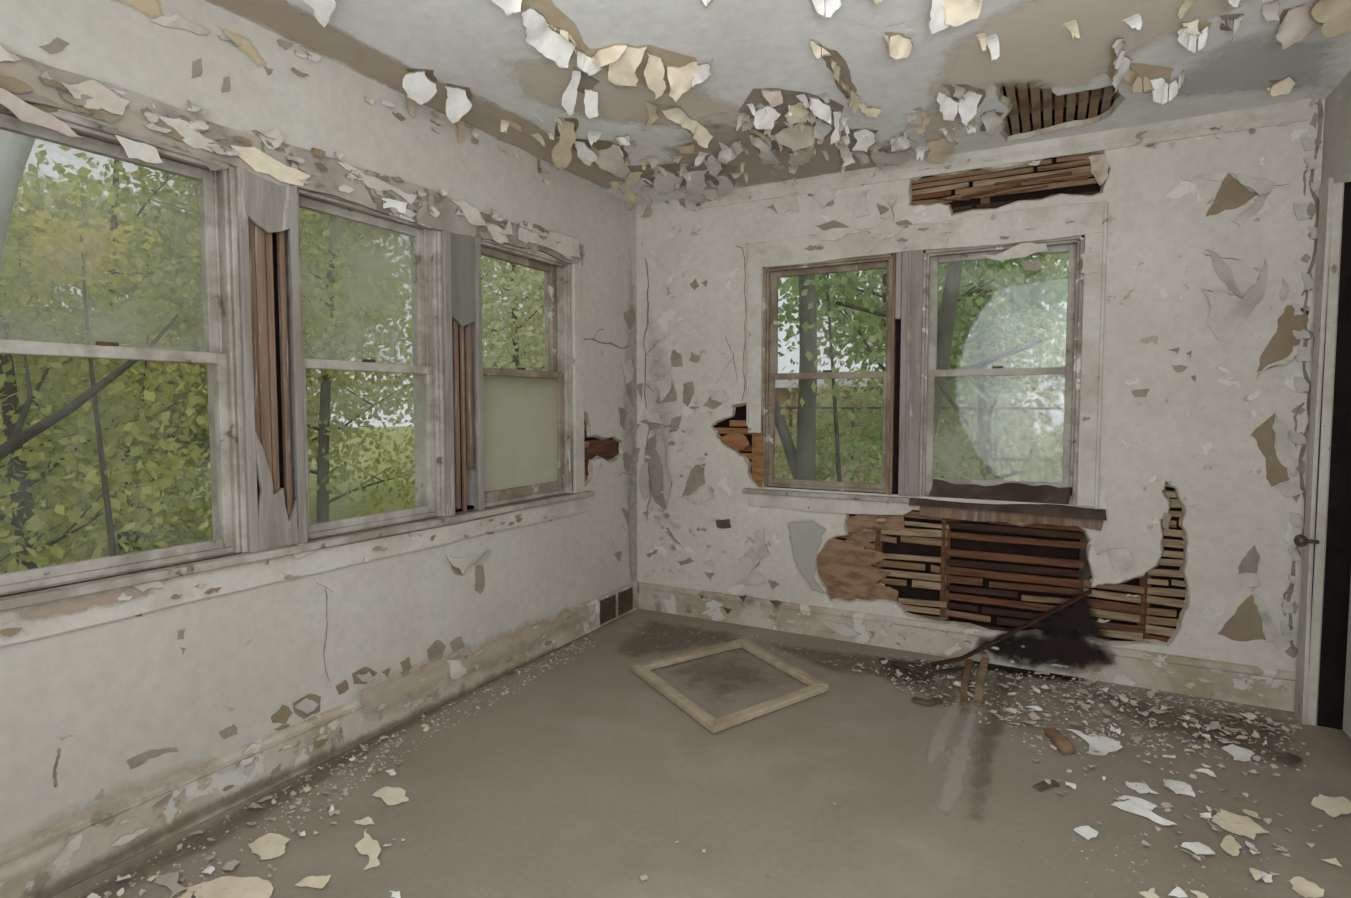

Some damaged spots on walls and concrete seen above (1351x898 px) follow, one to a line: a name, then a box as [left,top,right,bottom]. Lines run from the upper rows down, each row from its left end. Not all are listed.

peeling [1178,0,1244,53]
peeling [1262,0,1351,50]
peeling [0,45,585,260]
peeling [492,0,1184,253]
peeling [1180,171,1276,227]
peeling [1202,99,1322,527]
peeling [570,349,861,636]
flaking render [815,481,1198,661]
peeling [1218,544,1299,658]
damp [33,606,588,898]
peeling [997,664,1302,746]
damp [0,837,64,880]